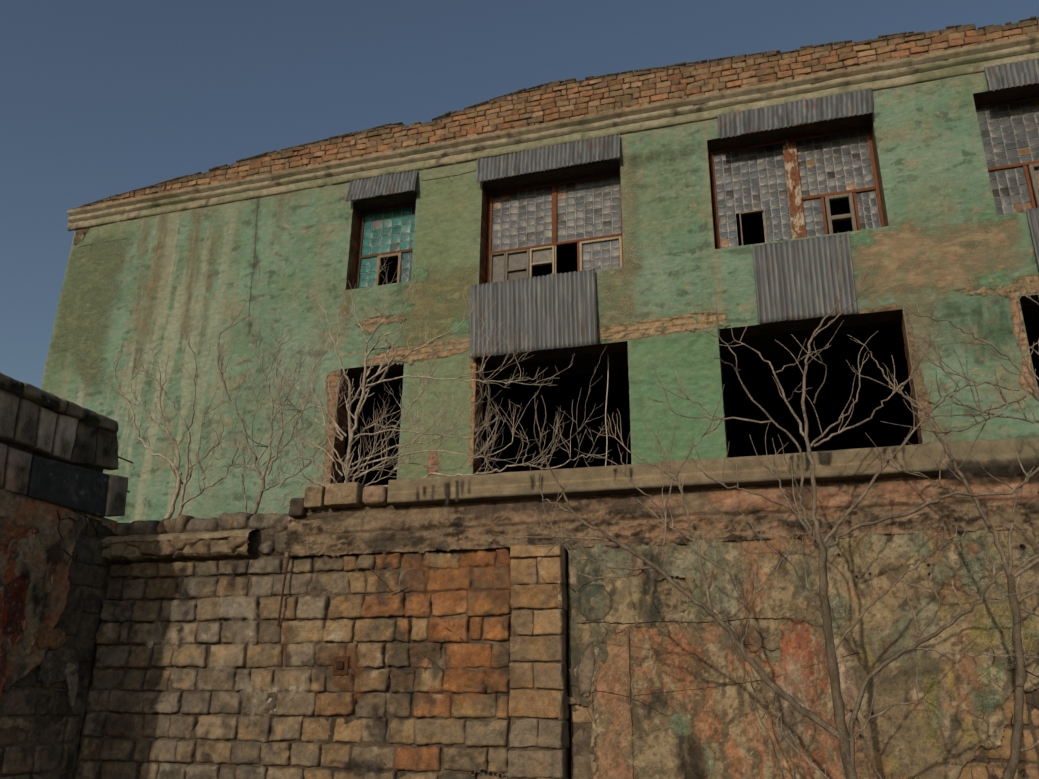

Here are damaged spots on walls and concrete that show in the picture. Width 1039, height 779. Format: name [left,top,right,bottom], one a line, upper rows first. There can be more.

spalling [362,334,476,467]
peeling [849,209,1039,433]
peeling [0,517,55,697]
spalling [284,470,1039,557]
peeling [567,574,862,779]
crack [569,581,860,779]
spalling [948,543,1039,779]